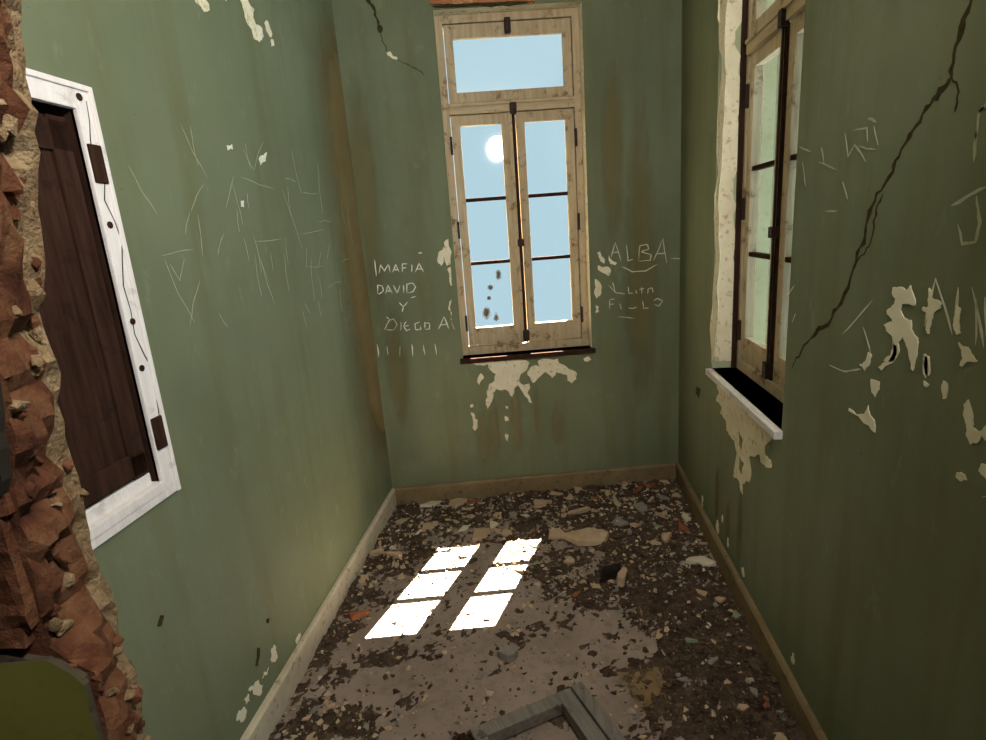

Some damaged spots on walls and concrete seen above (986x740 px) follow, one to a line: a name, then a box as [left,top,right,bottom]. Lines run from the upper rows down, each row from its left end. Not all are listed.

peeling [195,0,210,12]
peeling [240,0,274,46]
crack [366,0,424,75]
flaking render [0,99,18,143]
peeling [710,0,742,363]
crack [792,0,972,368]
peeling [473,359,577,421]
peeling [716,386,772,494]
peeling [848,285,948,432]
peeling [953,305,978,367]
peeling [963,399,986,444]
peeling [236,645,278,723]